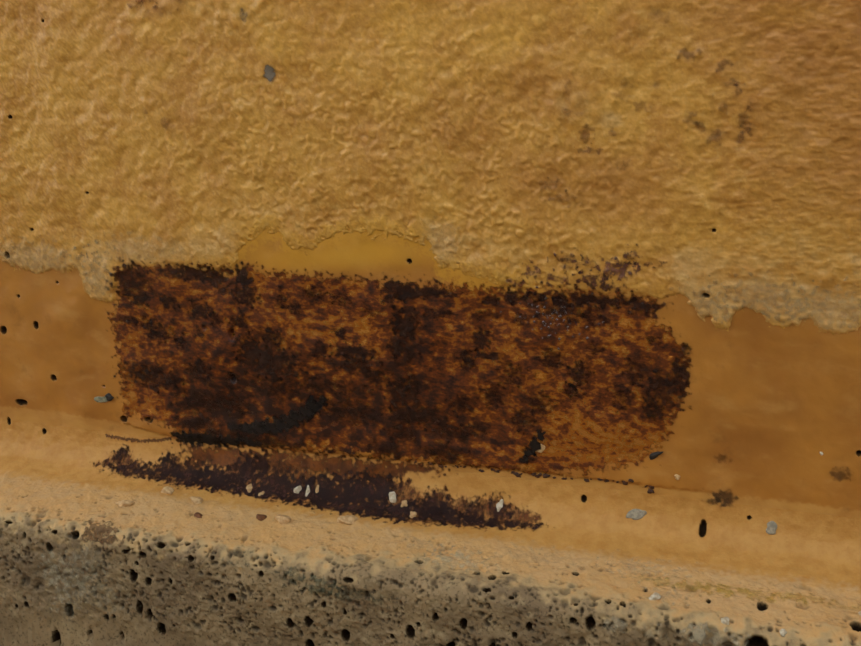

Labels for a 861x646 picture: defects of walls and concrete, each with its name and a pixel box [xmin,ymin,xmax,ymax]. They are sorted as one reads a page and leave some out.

peeling [94,385,114,402]
corrosion [93,244,691,530]